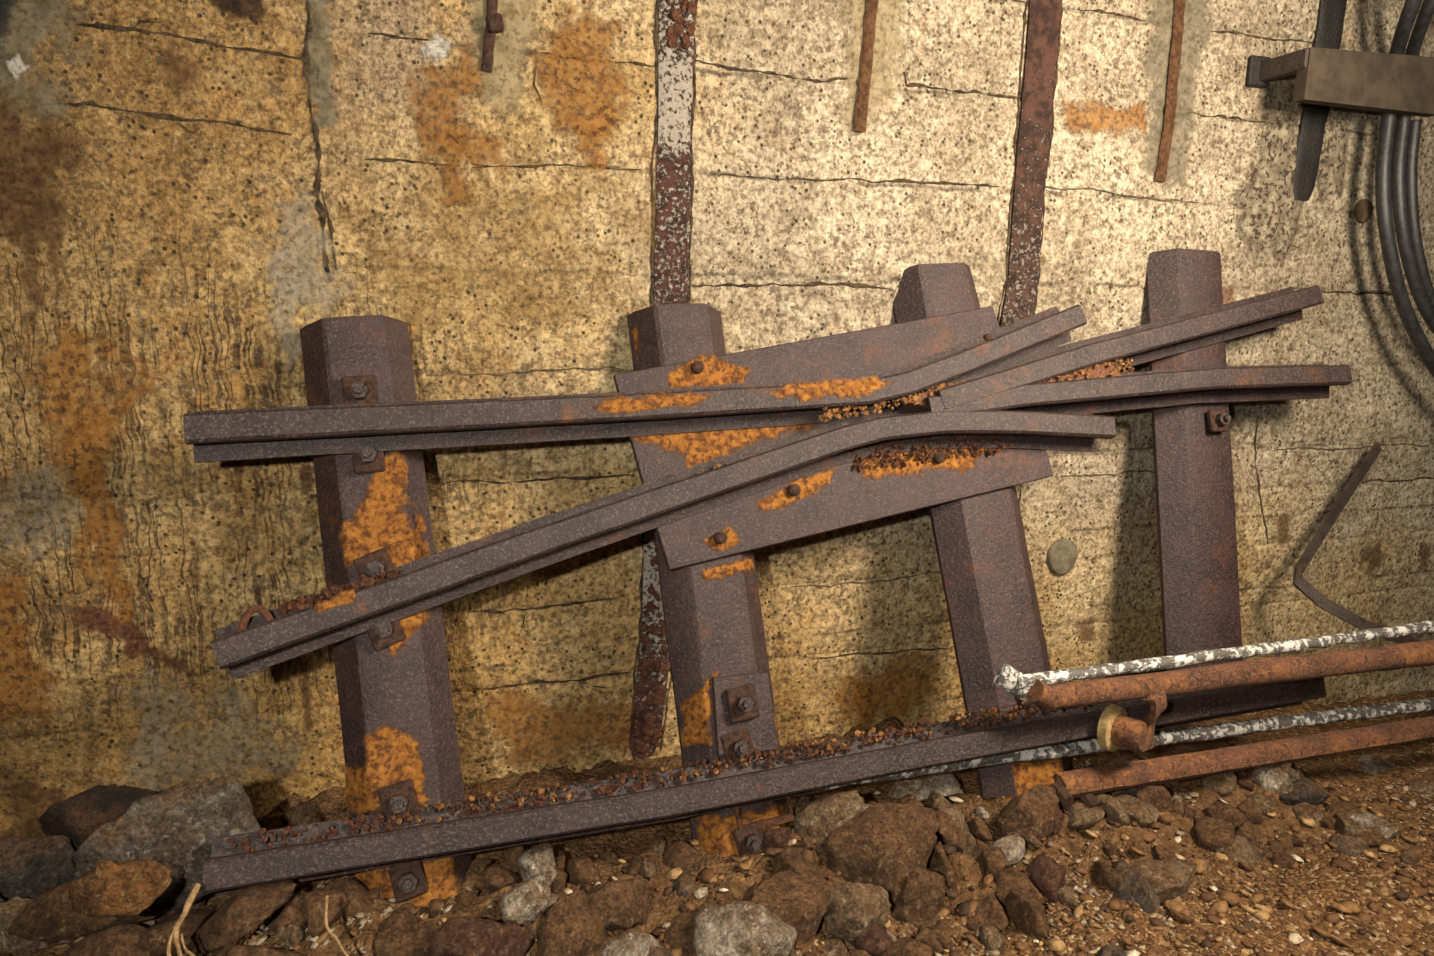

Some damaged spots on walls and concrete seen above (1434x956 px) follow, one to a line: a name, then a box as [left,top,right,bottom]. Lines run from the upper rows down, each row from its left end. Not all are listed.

crack [43,0,337,282]
rust [411,0,503,206]
rust [535,7,625,169]
rust [1066,0,1186,182]
rust [77,604,197,677]